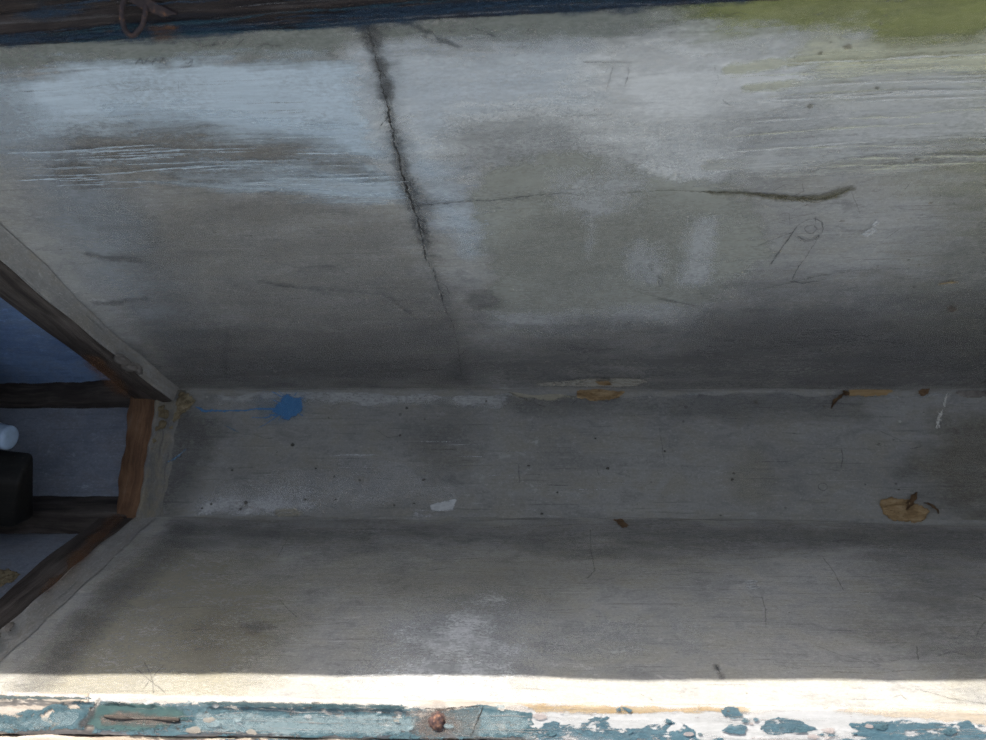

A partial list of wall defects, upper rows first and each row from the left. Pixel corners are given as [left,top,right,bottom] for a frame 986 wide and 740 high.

damp [0,0,725,70]
damp [717,44,986,139]
damp [703,137,986,177]
damp [0,97,408,352]
crack [360,24,565,376]
crack [610,188,854,203]
peeling [0,698,986,740]